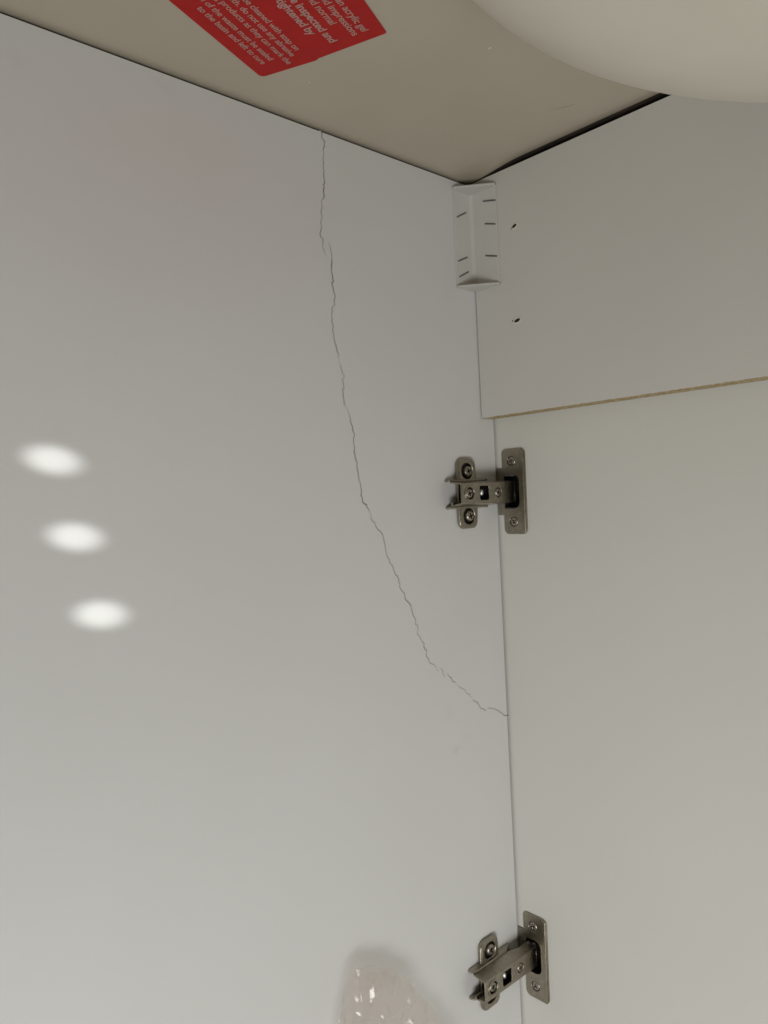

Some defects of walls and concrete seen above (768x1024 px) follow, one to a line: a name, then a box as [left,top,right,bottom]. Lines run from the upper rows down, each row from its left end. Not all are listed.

crack [318,131,508,718]